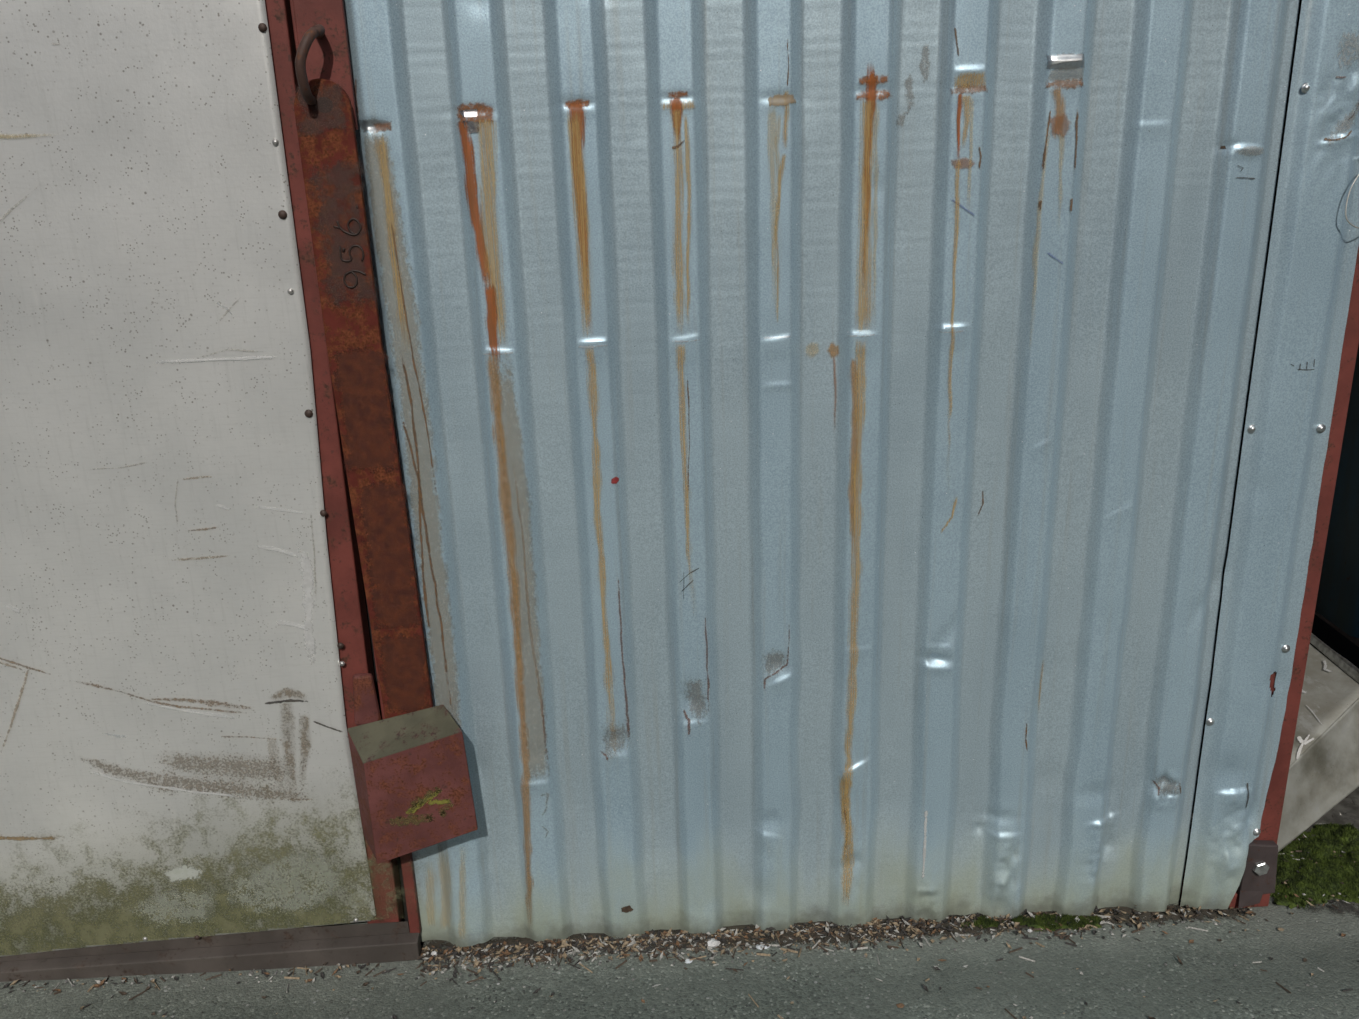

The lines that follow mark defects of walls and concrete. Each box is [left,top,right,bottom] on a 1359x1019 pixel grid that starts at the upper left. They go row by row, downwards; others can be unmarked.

corrosion [566,99,590,323]
corrosion [663,91,694,314]
corrosion [768,43,796,140]
corrosion [856,69,890,328]
corrosion [948,73,986,411]
corrosion [1042,78,1083,168]
corrosion [354,80,451,704]
corrosion [457,103,547,907]
corrosion [587,351,630,737]
corrosion [678,347,690,556]
corrosion [842,346,865,847]